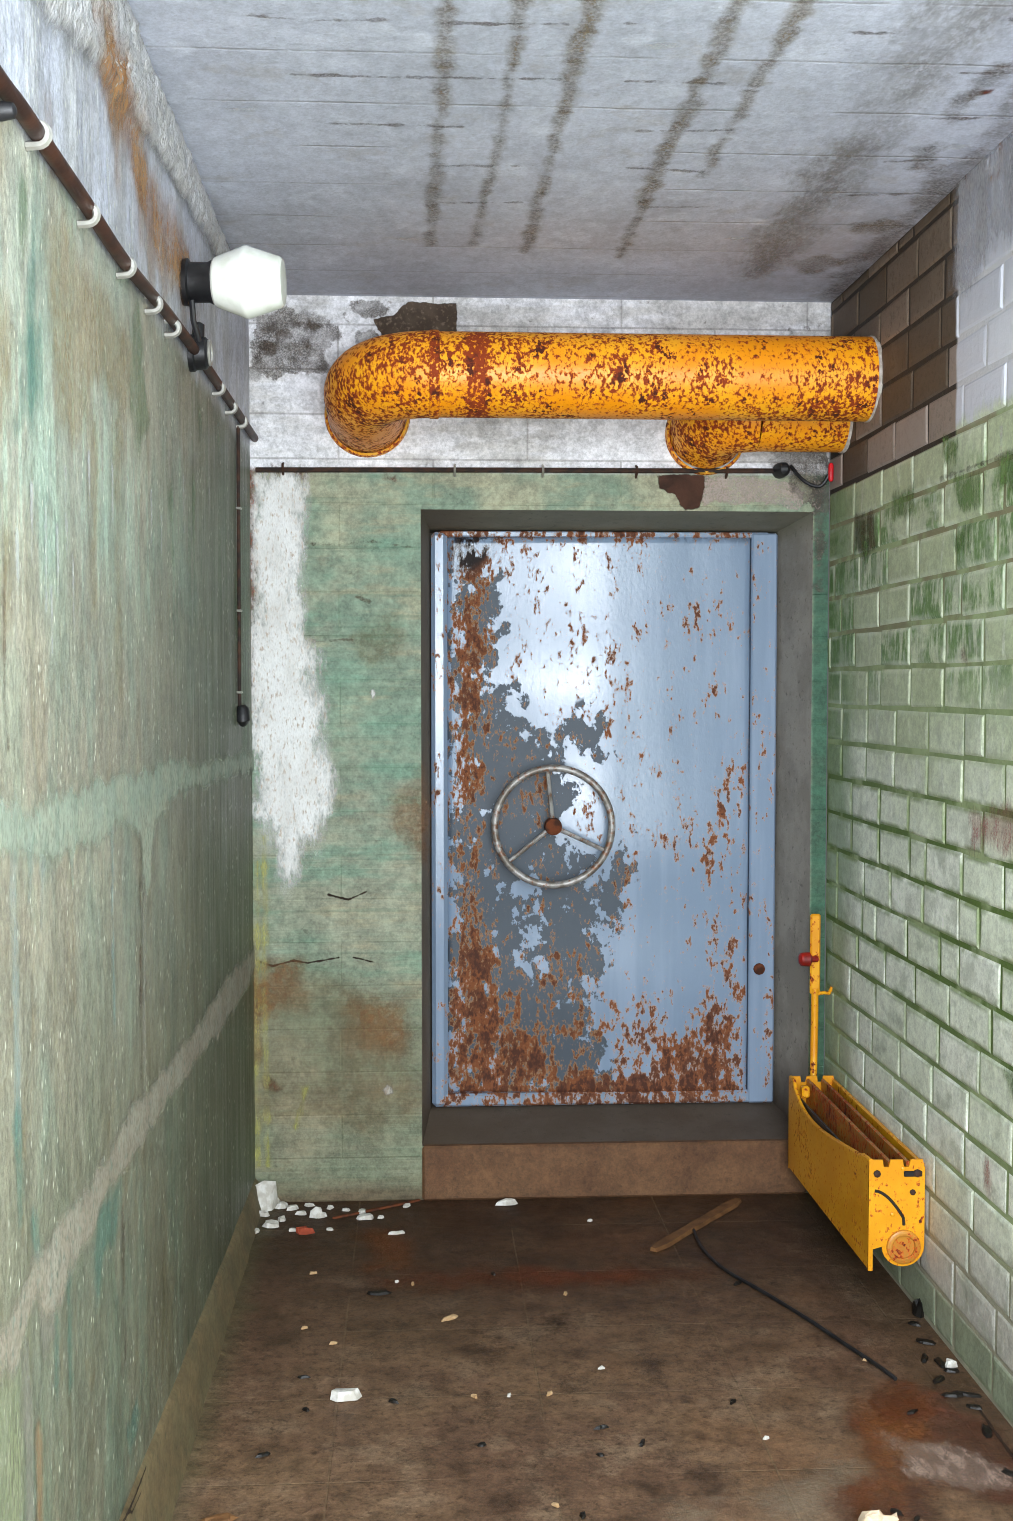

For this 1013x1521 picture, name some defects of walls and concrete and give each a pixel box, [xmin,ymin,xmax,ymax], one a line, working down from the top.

water stain [557,0,601,123]
water stain [777,8,805,47]
corrosion [101,24,190,285]
water stain [640,112,690,206]
water stain [916,138,1013,290]
water stain [250,472,336,895]
water stain [255,1098,271,1167]
corrosion [836,1382,1013,1520]